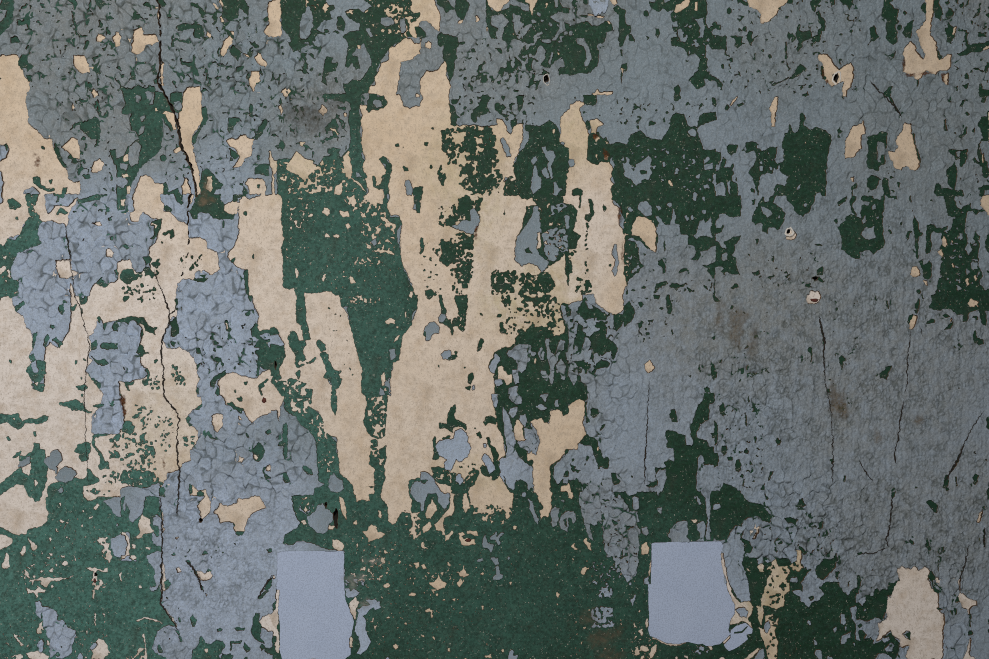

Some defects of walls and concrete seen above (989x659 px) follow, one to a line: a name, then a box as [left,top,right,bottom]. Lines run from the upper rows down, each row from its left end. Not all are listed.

peeling [52,0,124,56]
peeling [318,57,338,85]
peeling [640,0,865,126]
peeling [727,113,921,259]
peeling [653,281,694,319]
flaking render [799,244,838,364]
crack [66,231,90,487]
crack [819,317,834,482]
peeling [235,430,271,482]
flaking render [189,484,266,545]
crack [861,498,893,554]
flaking render [192,575,282,659]